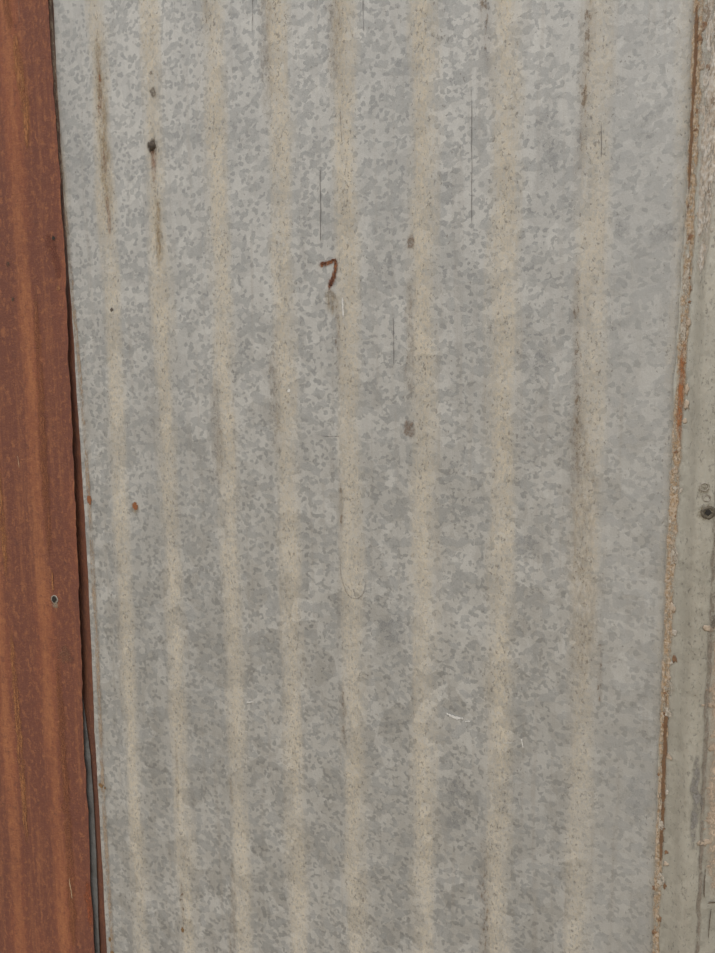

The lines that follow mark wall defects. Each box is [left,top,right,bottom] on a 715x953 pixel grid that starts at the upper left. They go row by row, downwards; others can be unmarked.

rust [320,258,337,305]
rust [652,0,707,953]